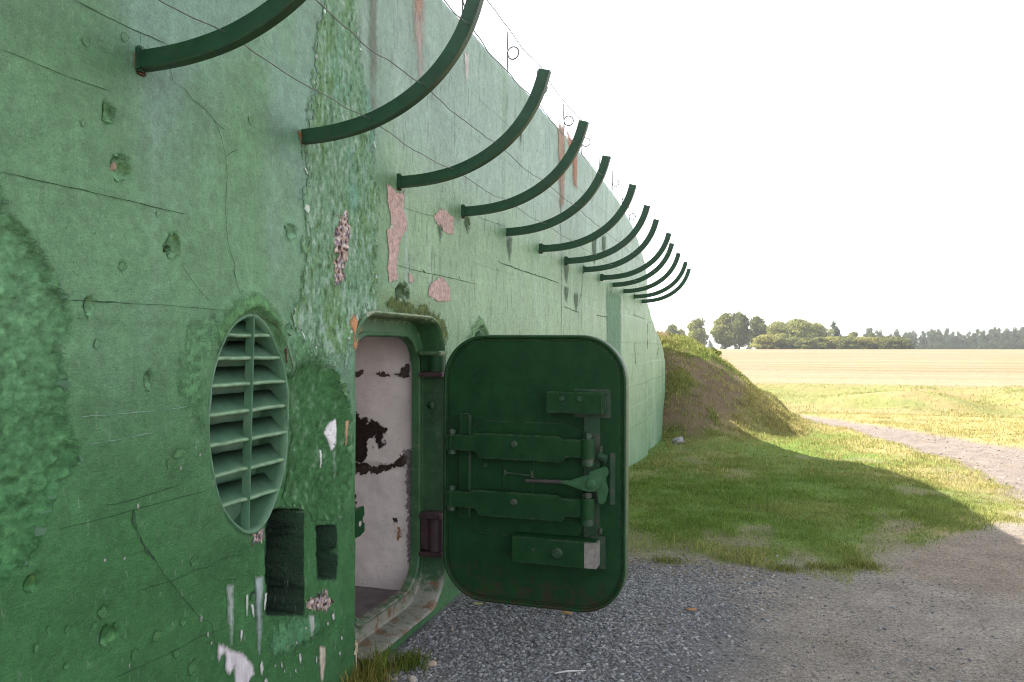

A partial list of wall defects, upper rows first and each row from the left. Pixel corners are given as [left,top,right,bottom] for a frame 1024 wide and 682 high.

spalling [306,0,371,128]
crack [71,69,293,373]
peeling [434,208,472,235]
corrosion [558,120,577,205]
spalling [278,129,414,526]
peeling [428,276,450,302]
crack [61,485,243,680]
spalling [306,589,334,613]